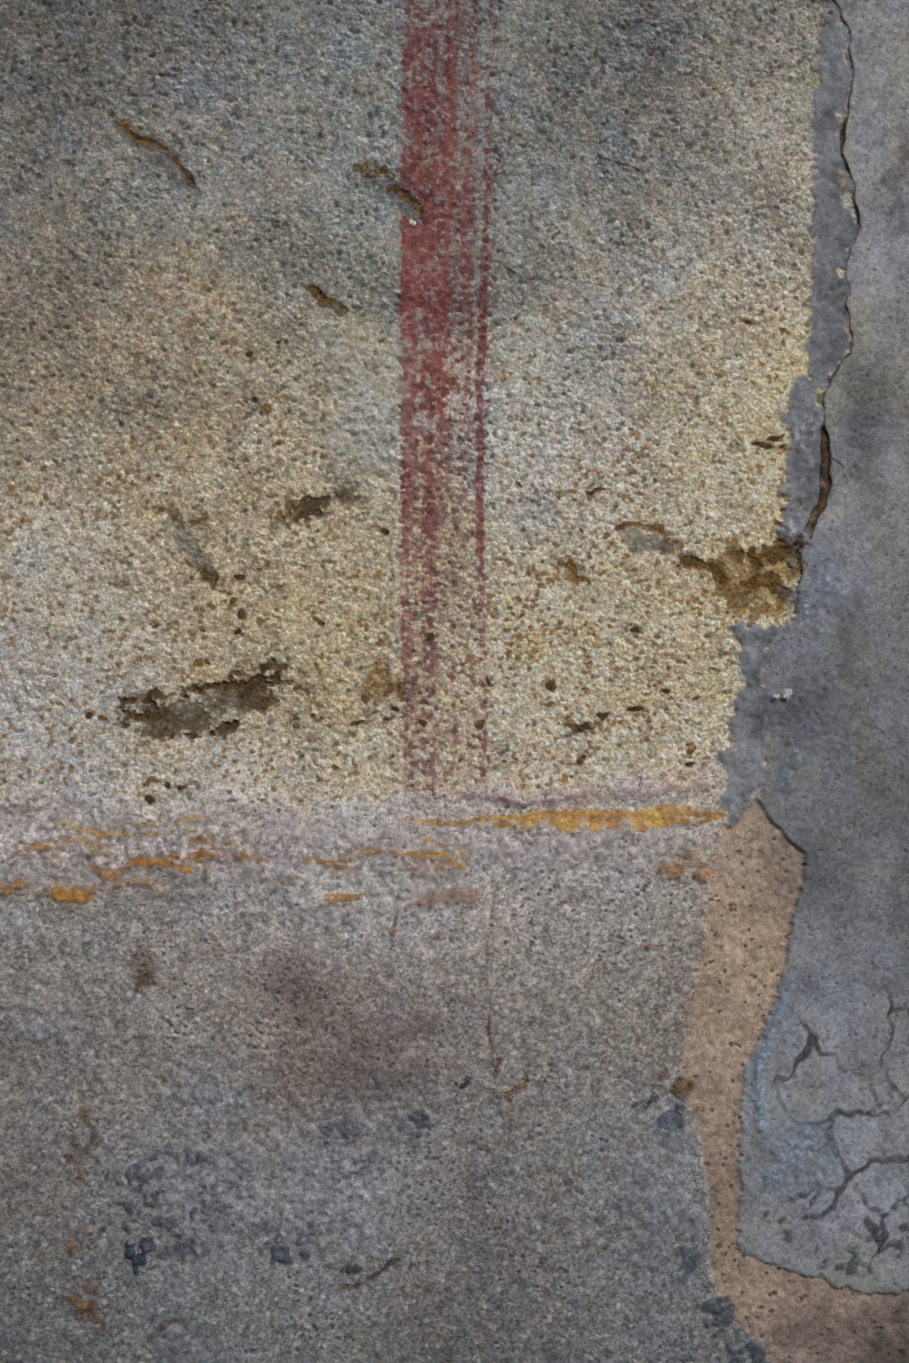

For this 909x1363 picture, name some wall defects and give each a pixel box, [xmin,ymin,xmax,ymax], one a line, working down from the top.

crack [780,0,860,626]
spalling [85,658,310,747]
spalling [676,508,806,624]
crack [774,978,909,1273]